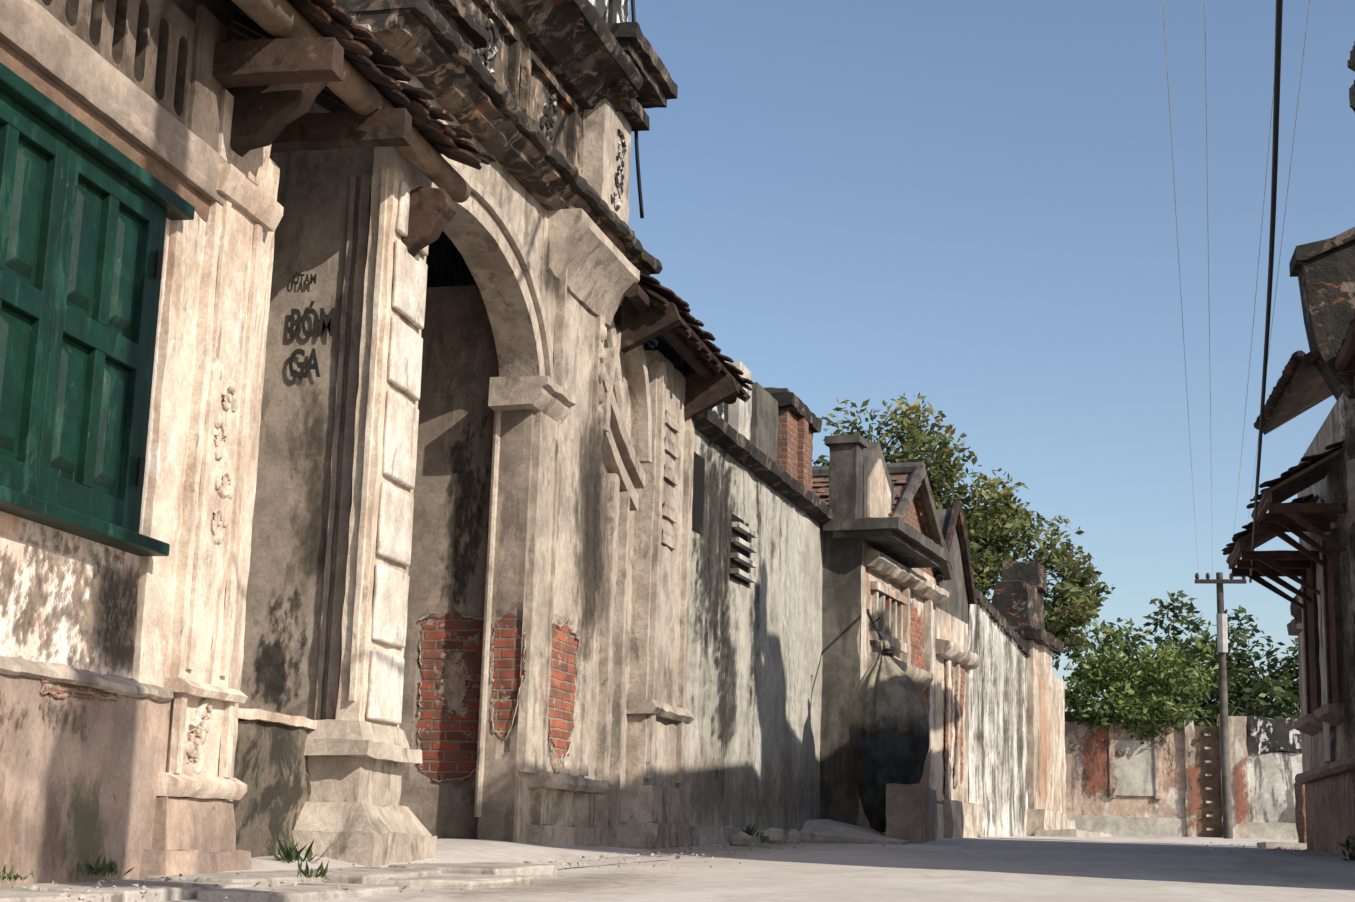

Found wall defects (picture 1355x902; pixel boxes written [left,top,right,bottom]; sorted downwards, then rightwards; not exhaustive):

peeling [0,521,138,742]
water stain [94,561,139,673]
flaking render [416,610,526,783]
flaking render [548,618,580,776]
water stain [685,427,776,796]
water stain [1332,389,1355,758]